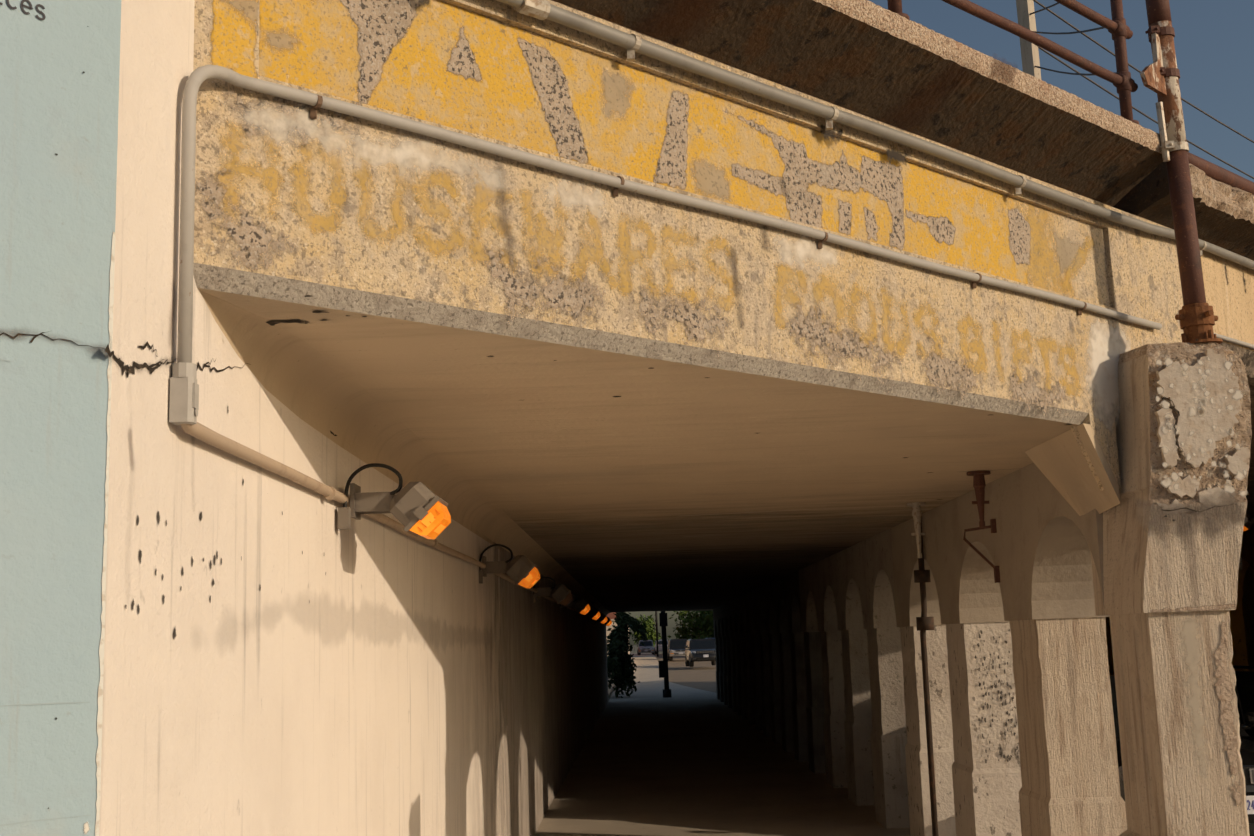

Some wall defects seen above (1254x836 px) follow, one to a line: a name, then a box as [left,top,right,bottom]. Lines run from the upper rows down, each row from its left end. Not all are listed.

crack [0,330,251,378]
peeling [487,250,605,323]
peeling [639,286,730,344]
peeling [787,305,901,383]
peeling [919,337,977,397]
peeling [1155,339,1250,521]